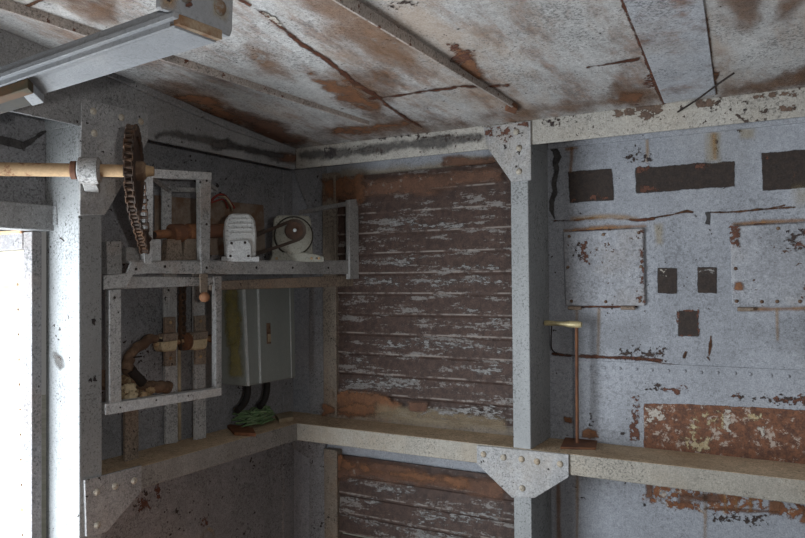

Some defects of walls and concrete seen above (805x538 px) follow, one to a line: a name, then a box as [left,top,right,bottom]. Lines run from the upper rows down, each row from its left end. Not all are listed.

peeling [612,104,664,120]
peeling [695,99,718,112]
peeling [737,90,797,114]
peeling [383,218,463,230]
peeling [364,264,502,287]
rust [321,390,427,418]
rust [643,403,805,464]
peeling [348,485,415,505]
rust [642,485,805,526]
peeling [349,509,502,538]